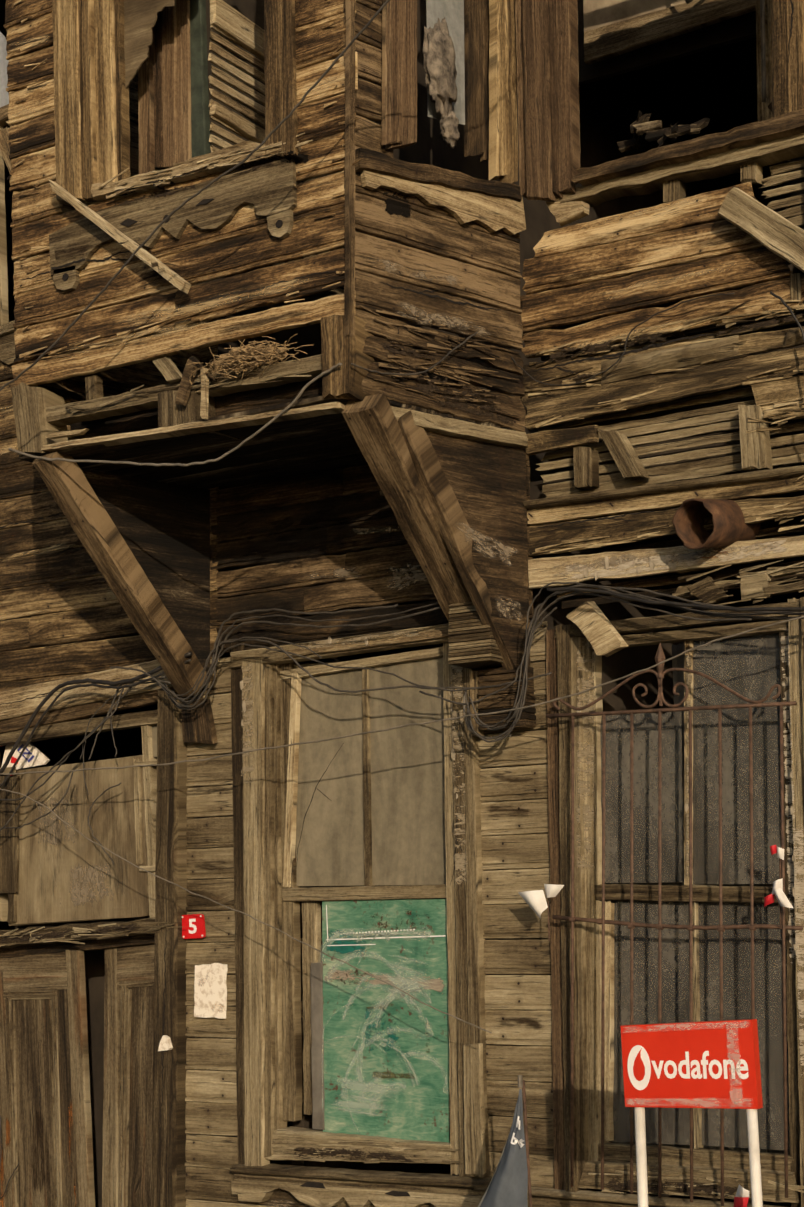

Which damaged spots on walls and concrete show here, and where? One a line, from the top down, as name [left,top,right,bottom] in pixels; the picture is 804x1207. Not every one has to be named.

peeling [448,646,468,884]
peeling [780,629,804,1076]